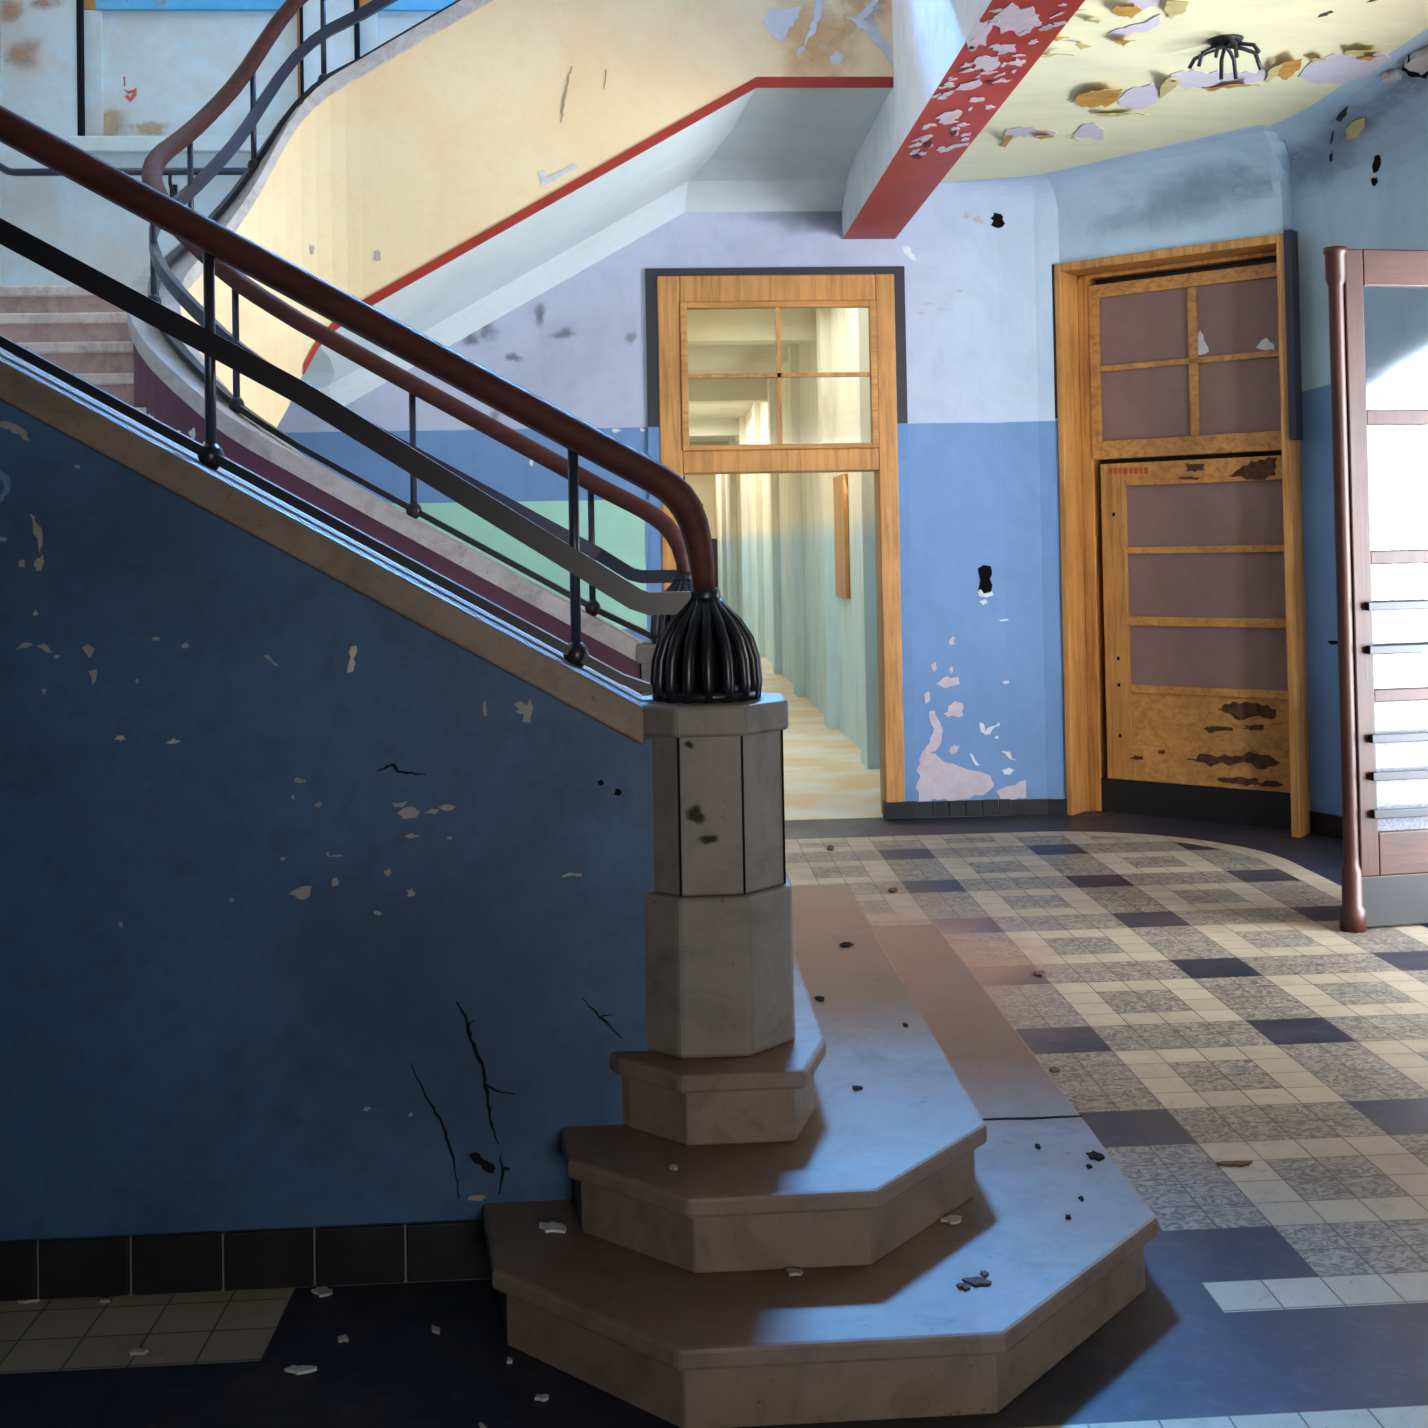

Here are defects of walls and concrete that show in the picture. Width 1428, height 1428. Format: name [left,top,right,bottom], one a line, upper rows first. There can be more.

peeling [763,0,824,57]
peeling [844,0,893,66]
peeling [908,0,1190,159]
peeling [1001,46,1428,147]
flaking render [1329,105,1366,162]
spalling [963,211,1009,229]
peeling [348,645,357,673]
peeling [514,700,533,723]
peeling [916,662,1026,802]
peeling [392,801,455,838]
crack [455,1001,515,1194]
crack [410,1063,460,1199]